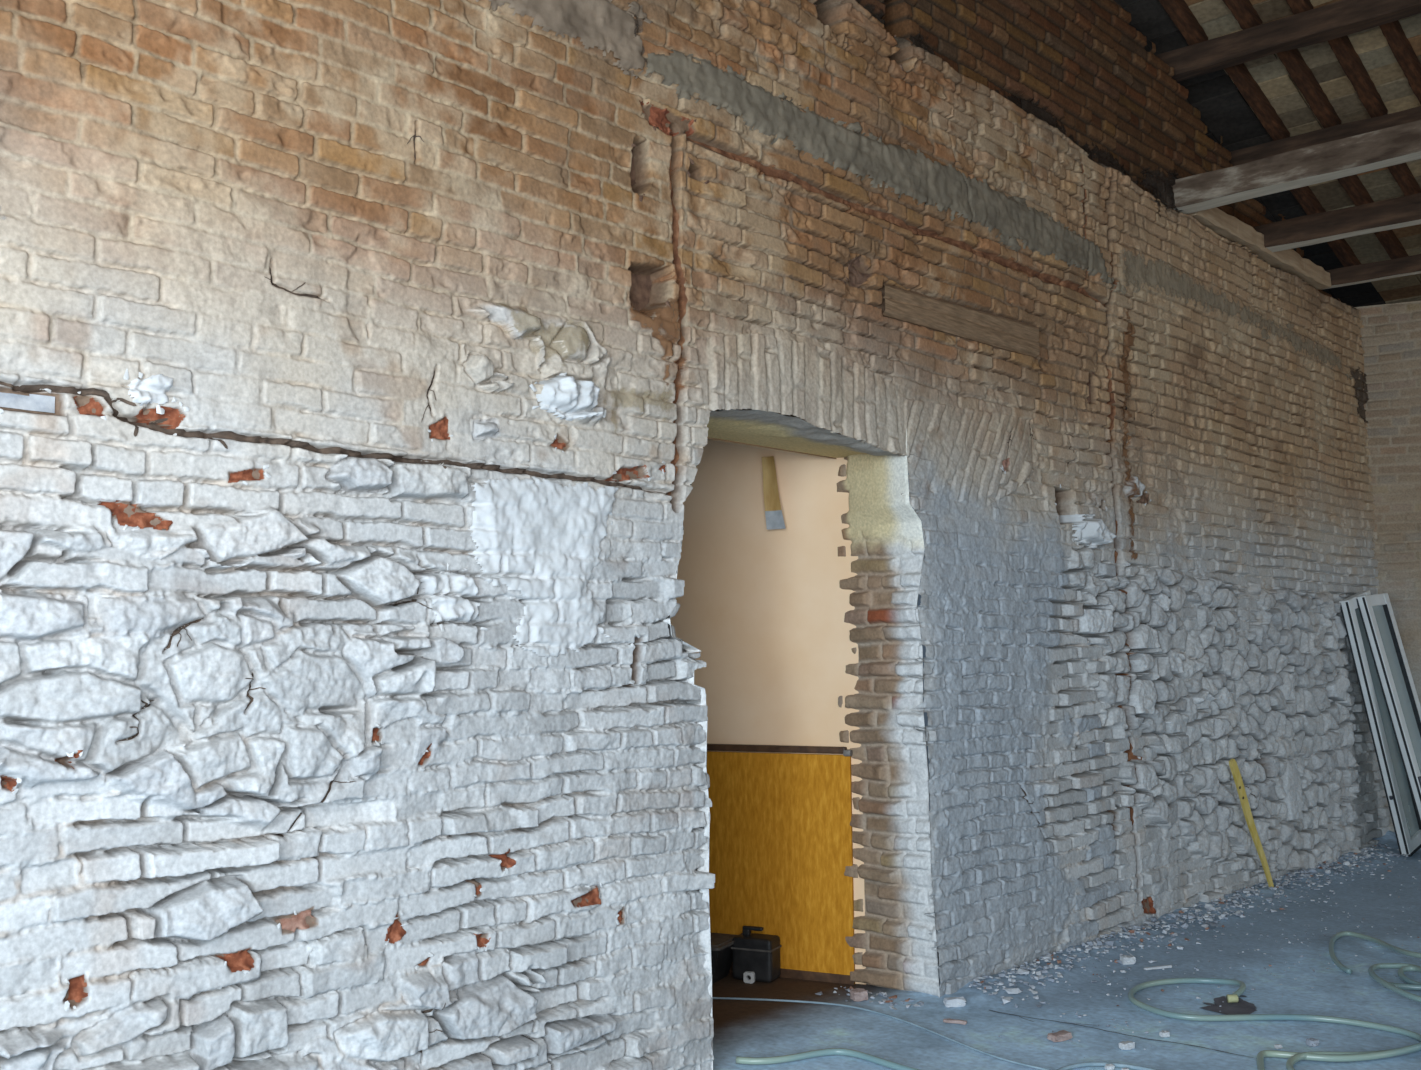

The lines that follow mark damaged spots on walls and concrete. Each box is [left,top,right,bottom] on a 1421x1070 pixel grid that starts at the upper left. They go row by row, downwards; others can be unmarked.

crack [421,371,436,423]
crack [0,381,666,495]
corrosion [1106,311,1140,560]
crack [389,587,432,609]
crack [162,618,203,652]
crack [245,672,266,710]
crack [119,700,154,741]
crack [277,754,356,837]